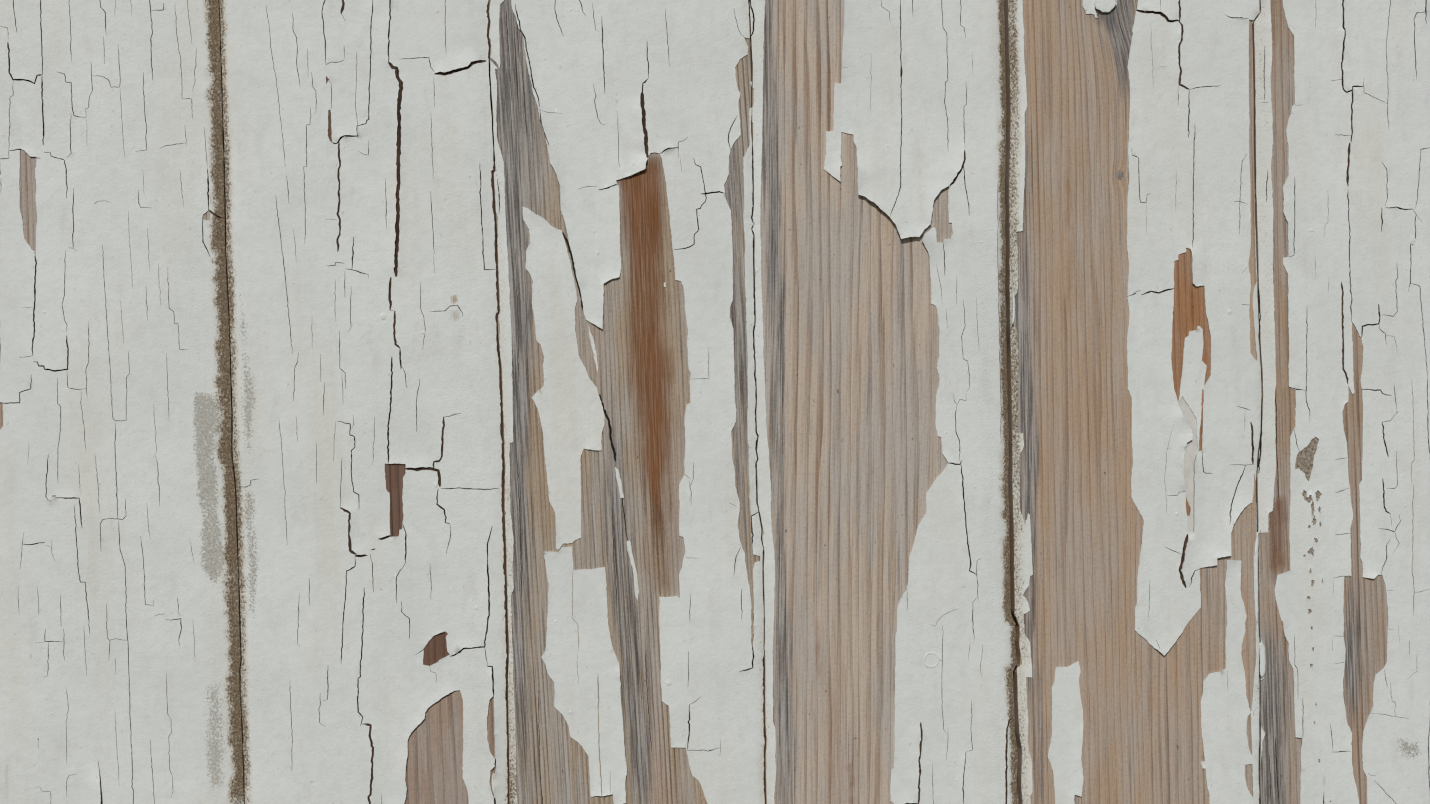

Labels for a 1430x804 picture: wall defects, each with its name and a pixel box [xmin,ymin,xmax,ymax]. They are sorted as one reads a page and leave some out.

crack [0,0,222,804]
peeling [385,463,406,537]
peeling [404,690,469,804]
crack [246,0,766,804]
peeling [495,0,707,804]
peeling [724,0,952,804]
peeling [1015,0,1323,804]
crack [1149,534,1199,598]
crack [1132,0,1217,242]
crack [1169,0,1430,630]
crack [1269,721,1347,804]
peeling [1342,323,1388,804]